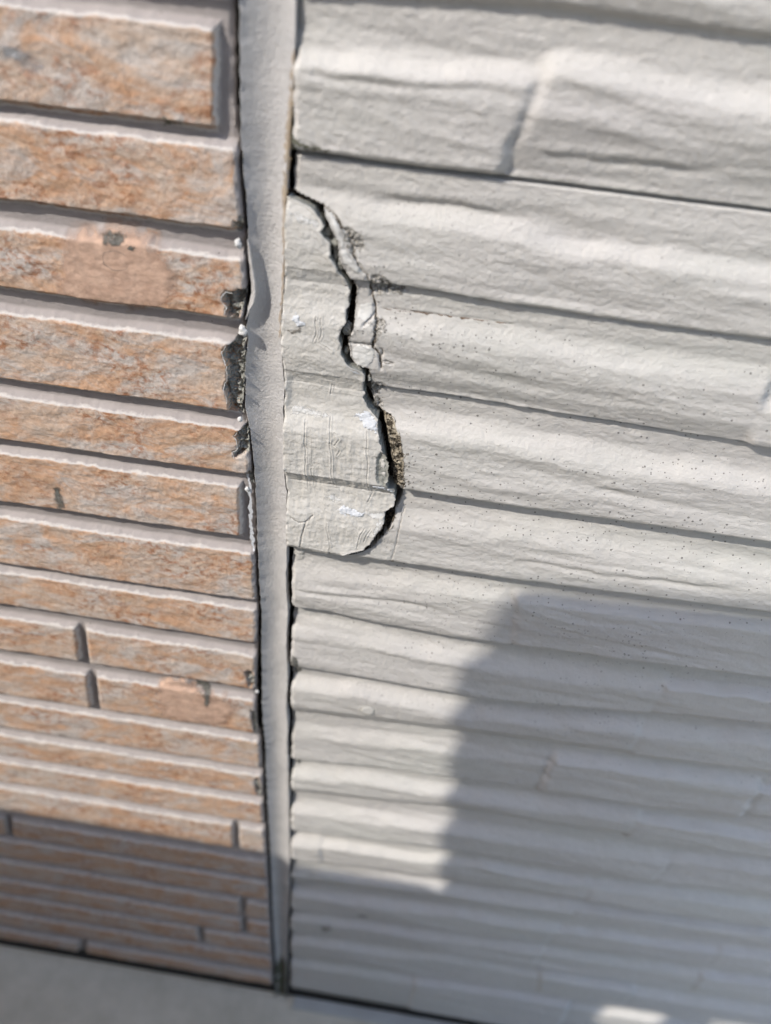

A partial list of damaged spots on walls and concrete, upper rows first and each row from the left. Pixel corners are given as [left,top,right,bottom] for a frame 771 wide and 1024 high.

crack [288,143,511,555]